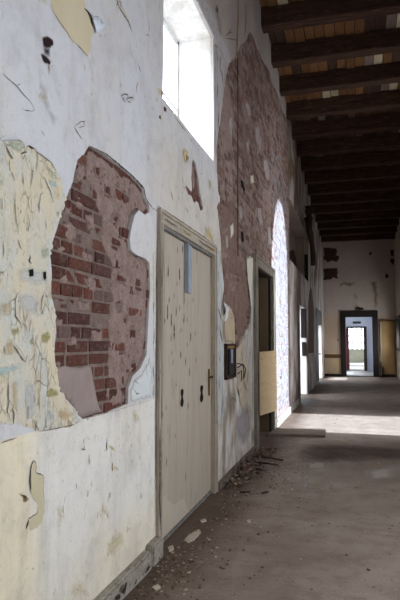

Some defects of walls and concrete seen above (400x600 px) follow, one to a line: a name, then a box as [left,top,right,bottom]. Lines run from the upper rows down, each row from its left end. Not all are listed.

peeling [51,0,105,56]
flaking render [183,151,208,216]
flaking render [209,3,299,430]
spalling [0,135,157,431]
spalling [315,247,339,280]
peeling [20,460,45,530]